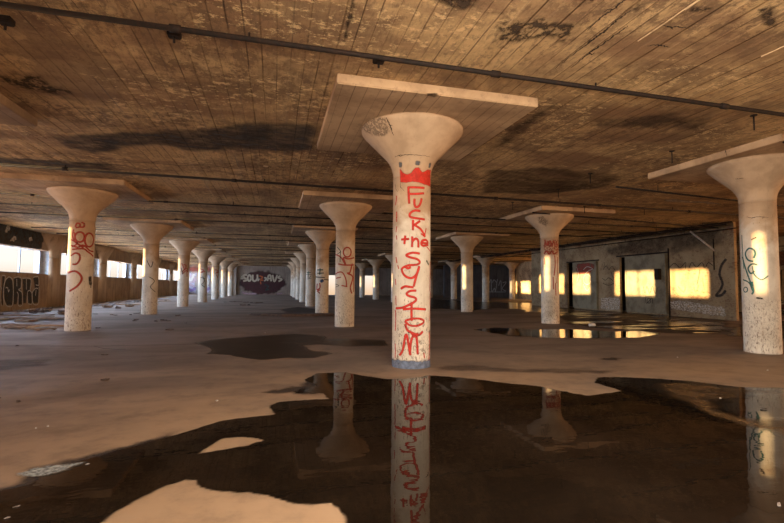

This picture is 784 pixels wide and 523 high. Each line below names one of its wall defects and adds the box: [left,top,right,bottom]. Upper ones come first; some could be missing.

leakage [442,0,472,9]
leakage [760,6,775,26]
leakage [498,18,574,41]
leakage [0,76,71,94]